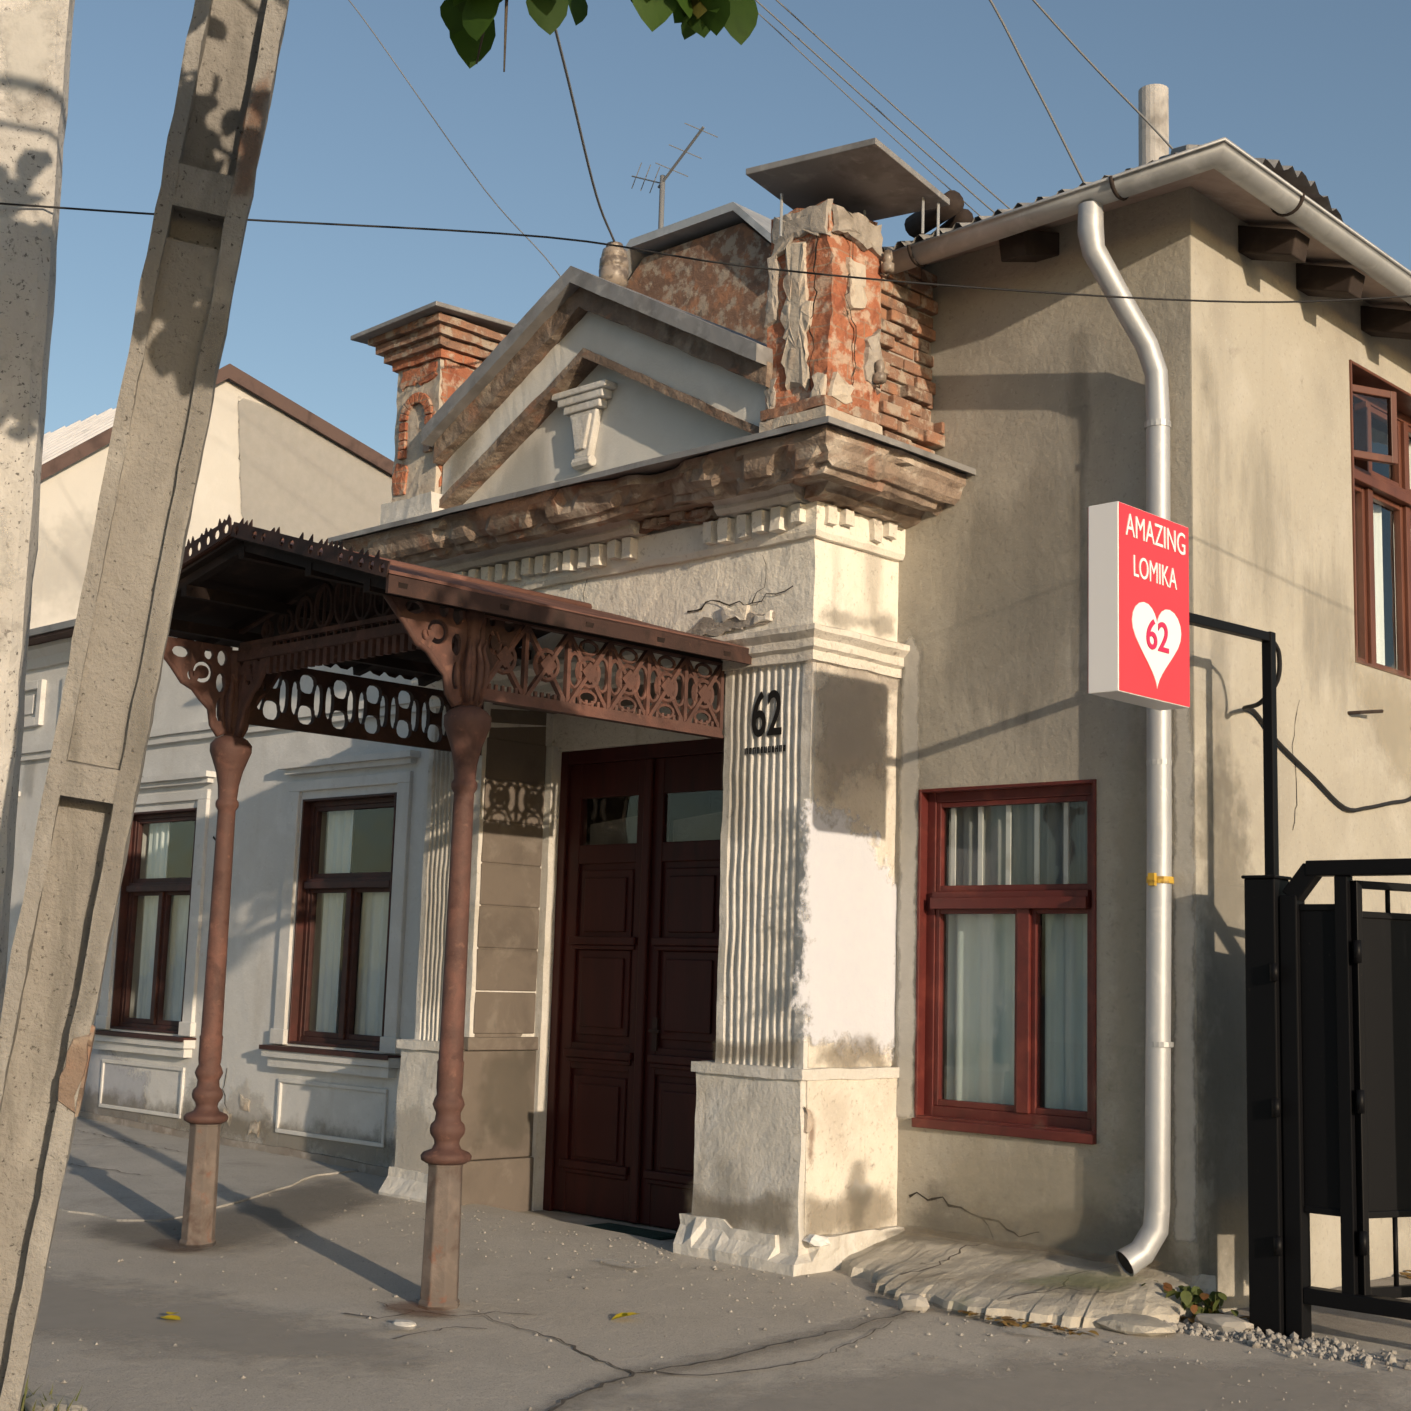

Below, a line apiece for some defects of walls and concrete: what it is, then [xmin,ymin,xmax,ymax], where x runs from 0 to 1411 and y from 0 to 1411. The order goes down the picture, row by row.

flaking render [764,199,883,421]
spalling [400,359,473,417]
spalling [392,463,409,496]
crack [687,555,793,613]
crack [900,1192,1039,1275]